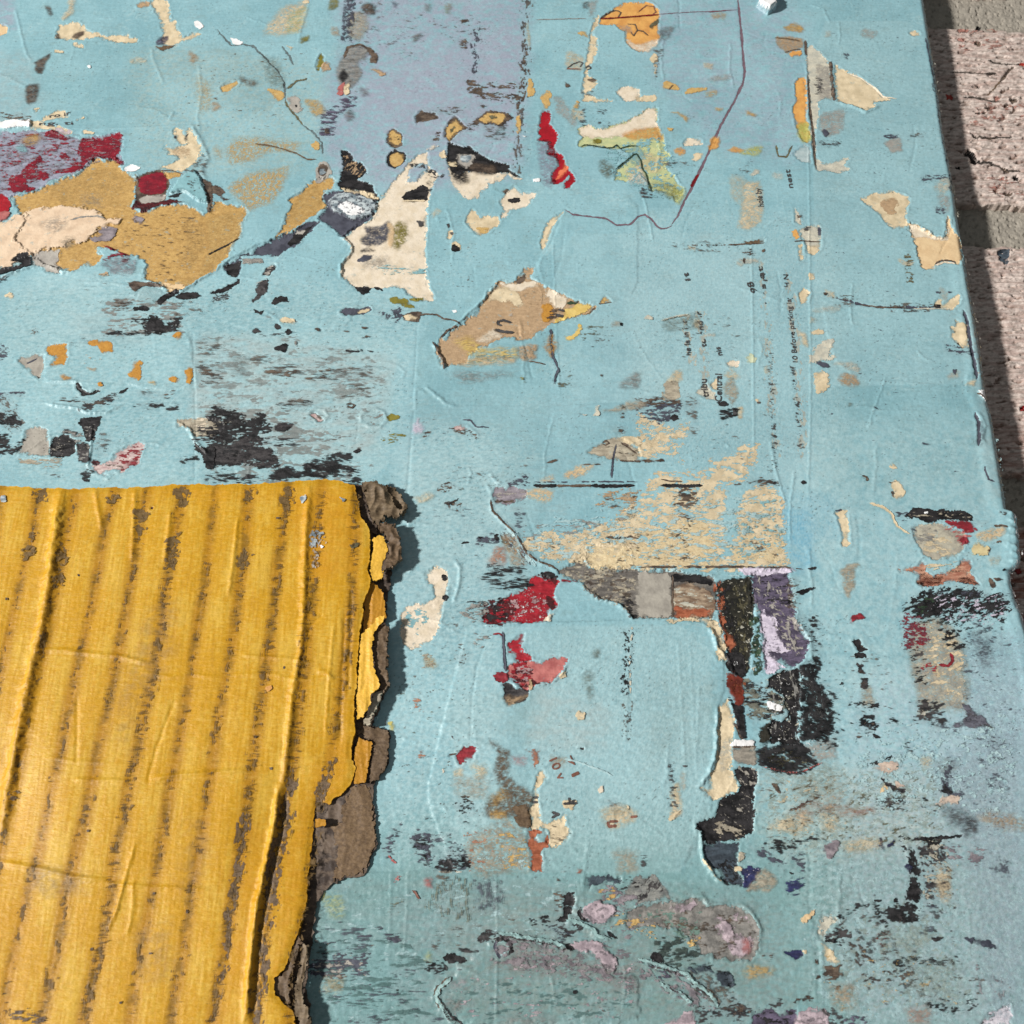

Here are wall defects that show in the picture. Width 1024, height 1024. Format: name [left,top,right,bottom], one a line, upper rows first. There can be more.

peeling [0,158,246,292]
peeling [524,2,716,189]
peeling [664,137,761,169]
peeling [775,24,911,173]
peeling [861,150,980,283]
spalling [970,96,1024,140]
peeling [249,265,299,352]
peeling [341,267,622,387]
peeling [419,467,482,512]
peeling [400,565,448,678]
peeling [450,371,898,891]
peeling [433,840,1024,1024]